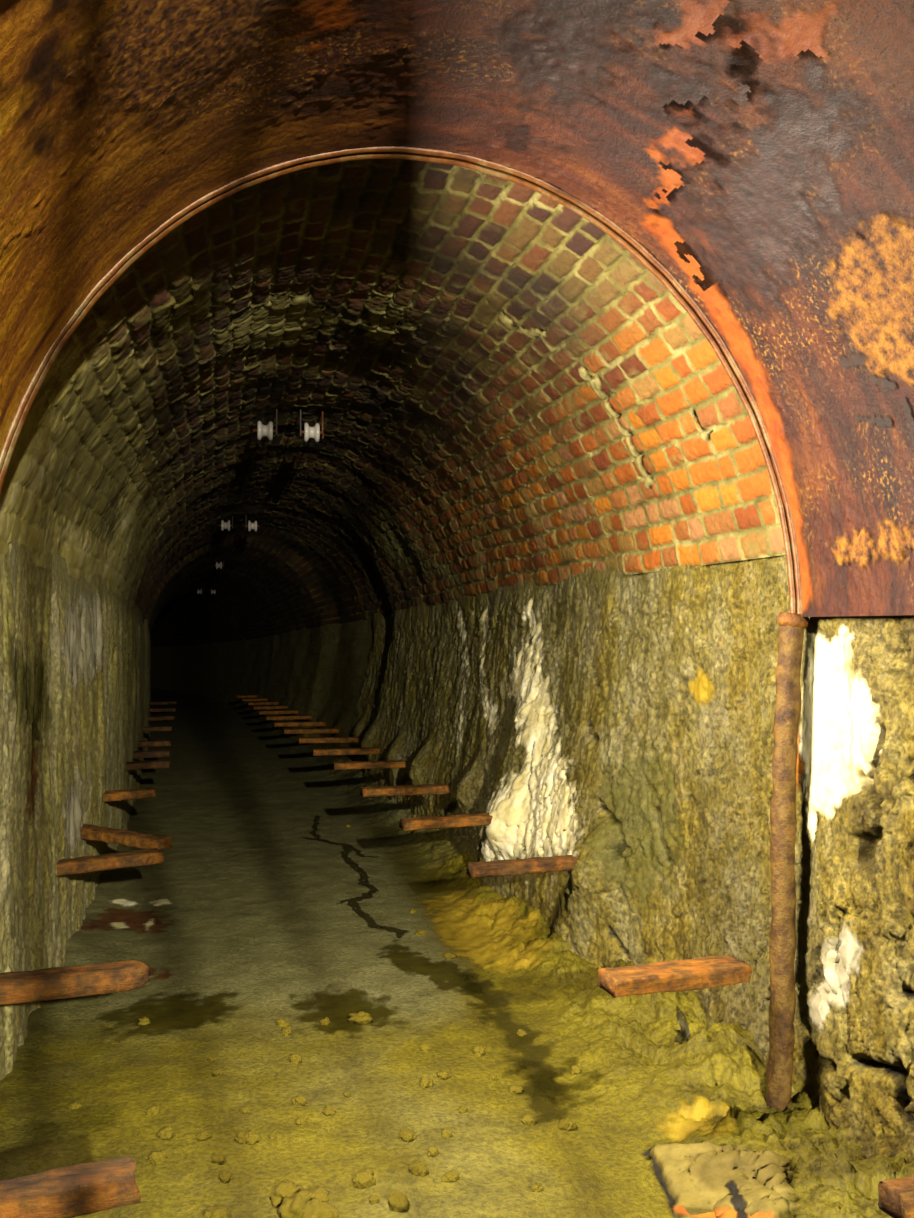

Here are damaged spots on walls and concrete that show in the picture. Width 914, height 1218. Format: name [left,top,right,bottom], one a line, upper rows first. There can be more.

corrosion [655,0,836,63]
corrosion [642,128,812,611]
corrosion [796,737,805,791]
crack [303,815,409,938]